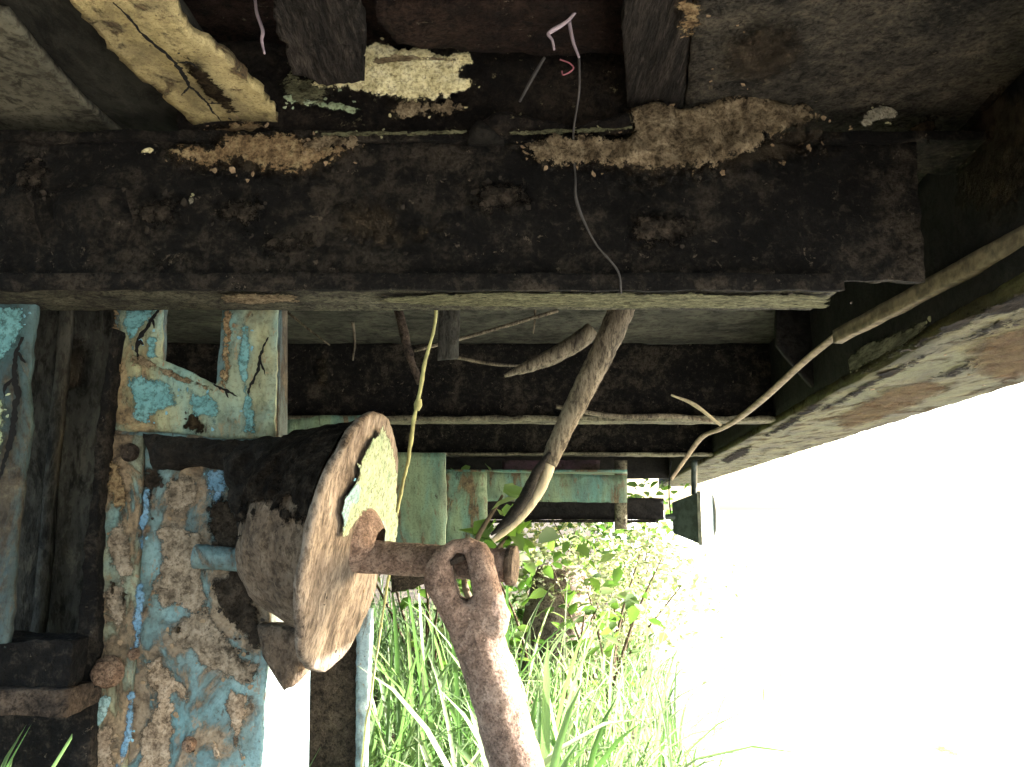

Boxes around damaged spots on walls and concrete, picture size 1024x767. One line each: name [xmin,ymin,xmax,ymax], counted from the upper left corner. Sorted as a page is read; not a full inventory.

crack [112,2,222,123]
peeling [279,37,480,139]
peeling [122,310,158,358]
crack [135,310,159,360]
crack [0,337,26,479]
peeling [127,375,218,431]
crack [213,337,269,398]
peeling [237,325,255,433]
peeling [203,470,226,502]
peeling [97,696,111,726]